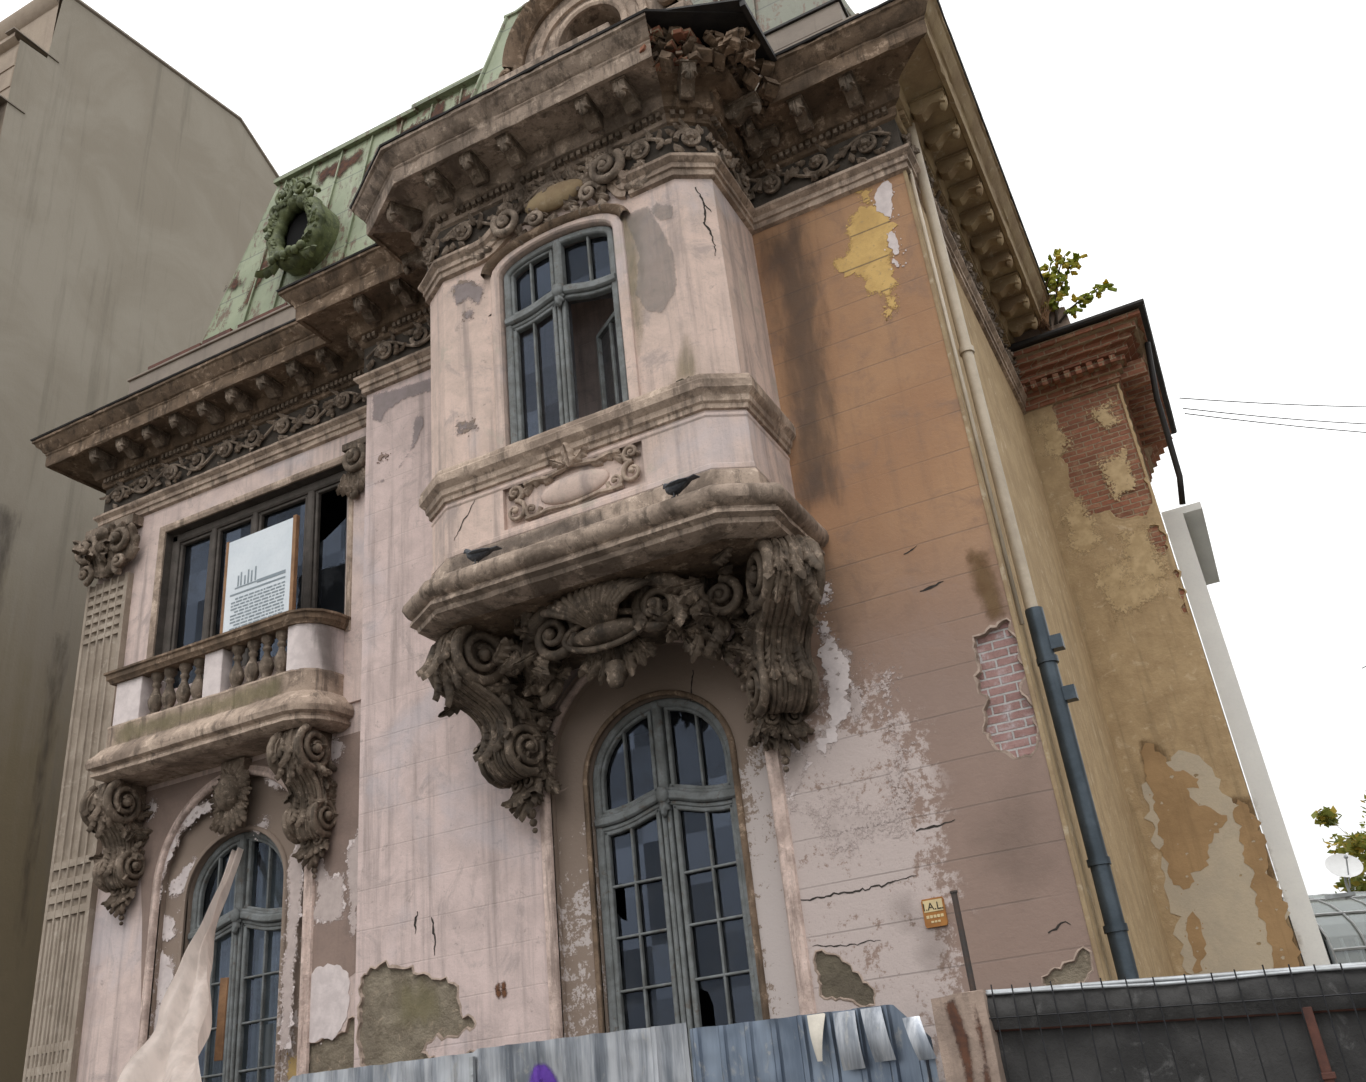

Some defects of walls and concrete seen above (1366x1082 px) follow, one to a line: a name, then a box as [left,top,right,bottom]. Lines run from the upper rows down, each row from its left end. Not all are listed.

crack [695,187,716,256]
peeling [833,180,907,321]
spalling [1029,383,1190,621]
spalling [972,618,1039,760]
peeling [141,771,221,1031]
spalling [277,731,477,1081]
crack [812,939,876,947]
spalling [813,949,876,1008]
crack [801,875,916,901]
corrosion [945,1000,991,1082]
spalling [1041,946,1094,986]
peeling [1140,742,1303,975]